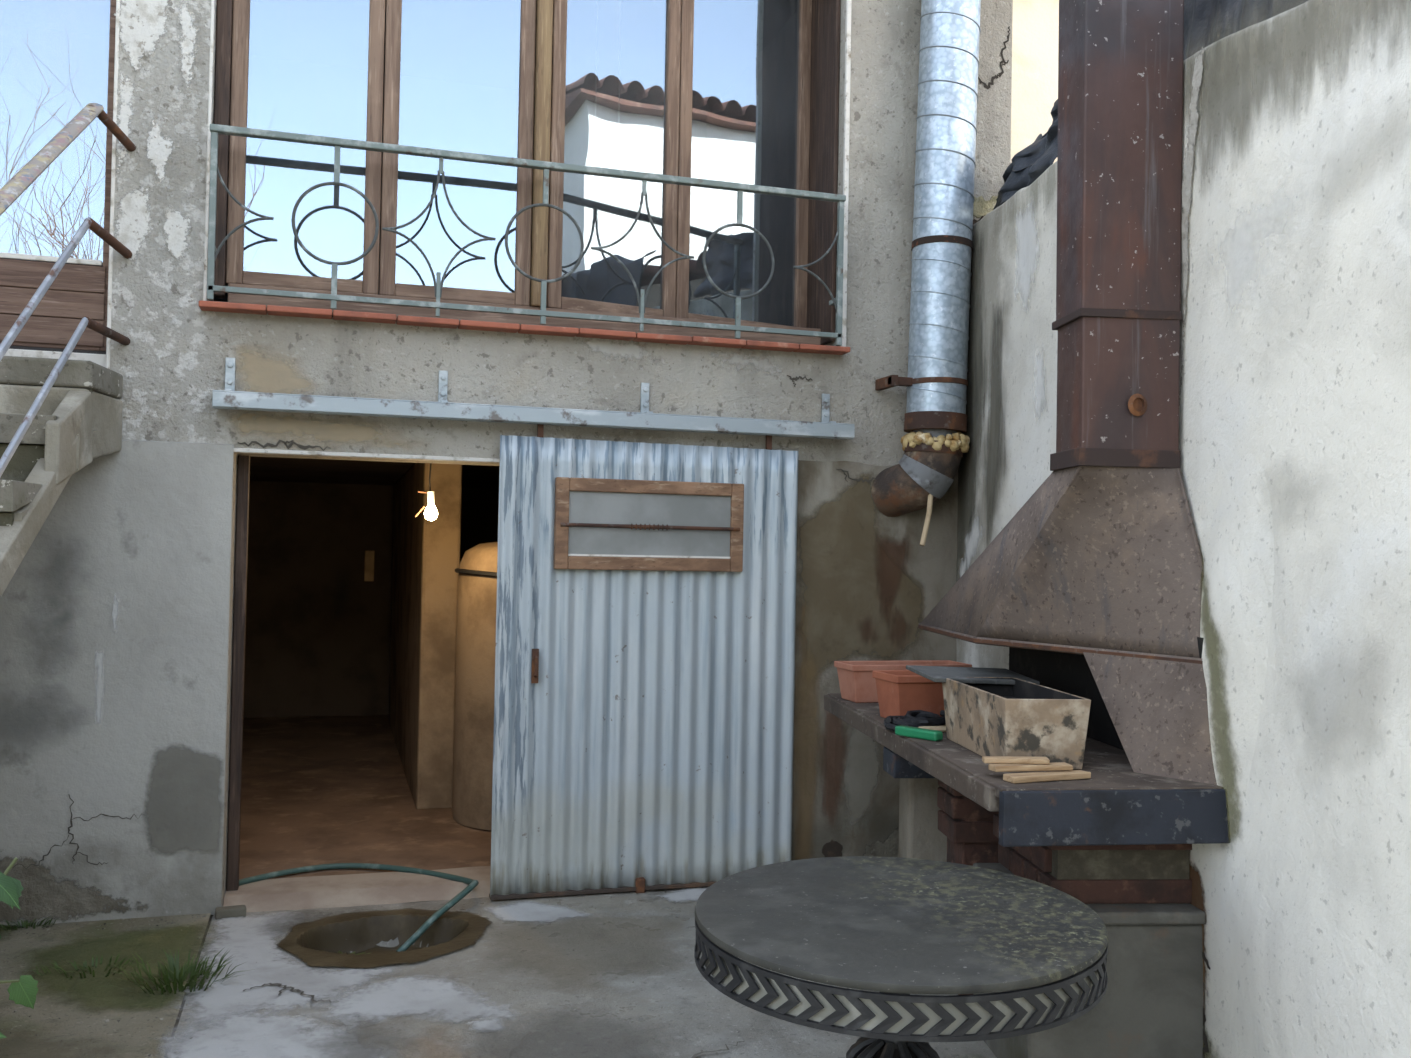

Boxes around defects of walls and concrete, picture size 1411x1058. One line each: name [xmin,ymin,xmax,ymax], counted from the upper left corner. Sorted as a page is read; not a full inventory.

peeling [114,0,197,173]
crack [978,26,1010,89]
leakage [1191,0,1411,155]
peeling [115,119,191,264]
leakage [1016,209,1039,306]
leakage [791,243,1005,861]
crack [8,795,146,869]
leakage [661,887,707,901]
leakage [165,901,589,1058]